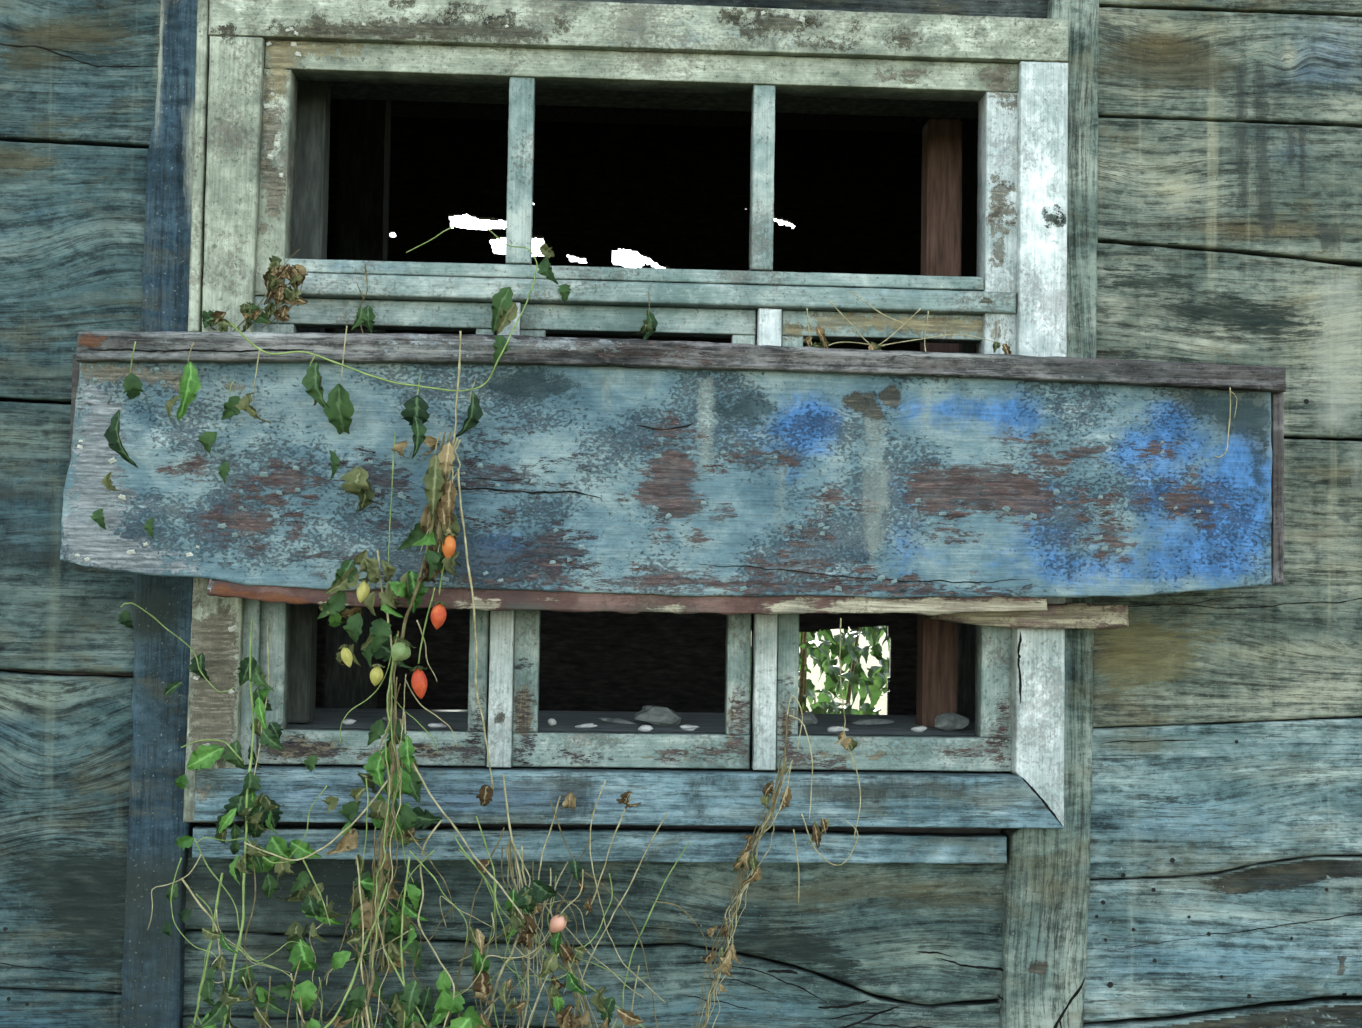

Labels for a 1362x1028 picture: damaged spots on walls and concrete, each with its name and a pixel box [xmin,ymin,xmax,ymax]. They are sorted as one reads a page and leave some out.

peeling [717,7,868,53]
peeling [885,26,924,53]
peeling [874,67,933,83]
peeling [973,63,1017,115]
peeling [986,172,1017,271]
peeling [435,410,935,601]
peeling [897,427,1231,574]
peeling [63,363,424,762]
peeling [258,701,486,765]
crack [677,962,932,1028]
crack [917,951,1006,1001]
crack [1053,978,1085,1028]